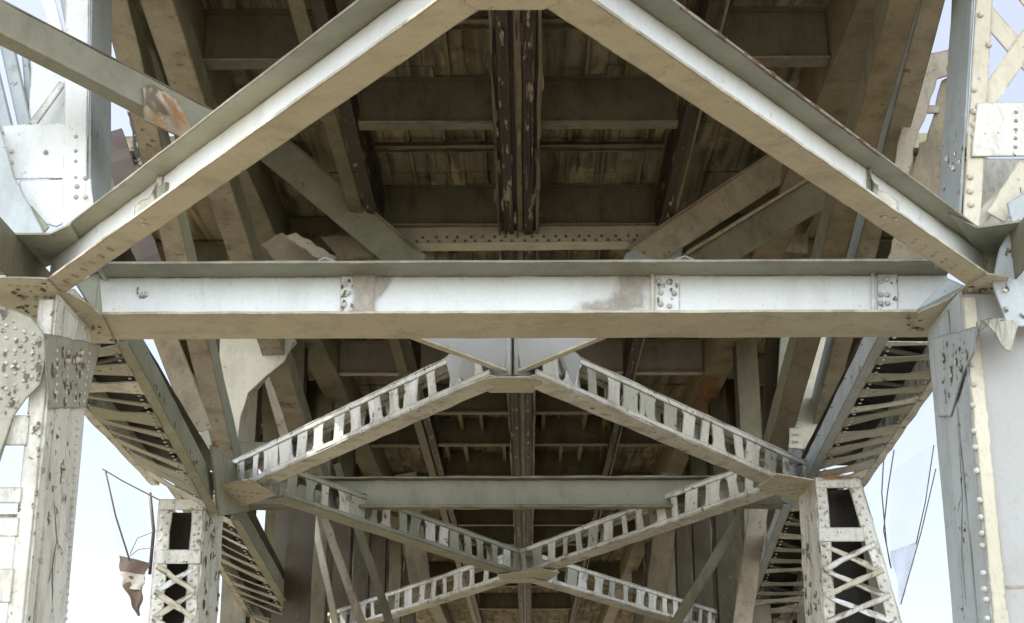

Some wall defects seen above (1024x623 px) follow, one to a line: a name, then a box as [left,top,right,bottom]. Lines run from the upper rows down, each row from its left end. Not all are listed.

peeling [485,10,544,236]
peeling [1,328,89,414]
peeling [941,341,967,404]
peeling [507,390,536,476]